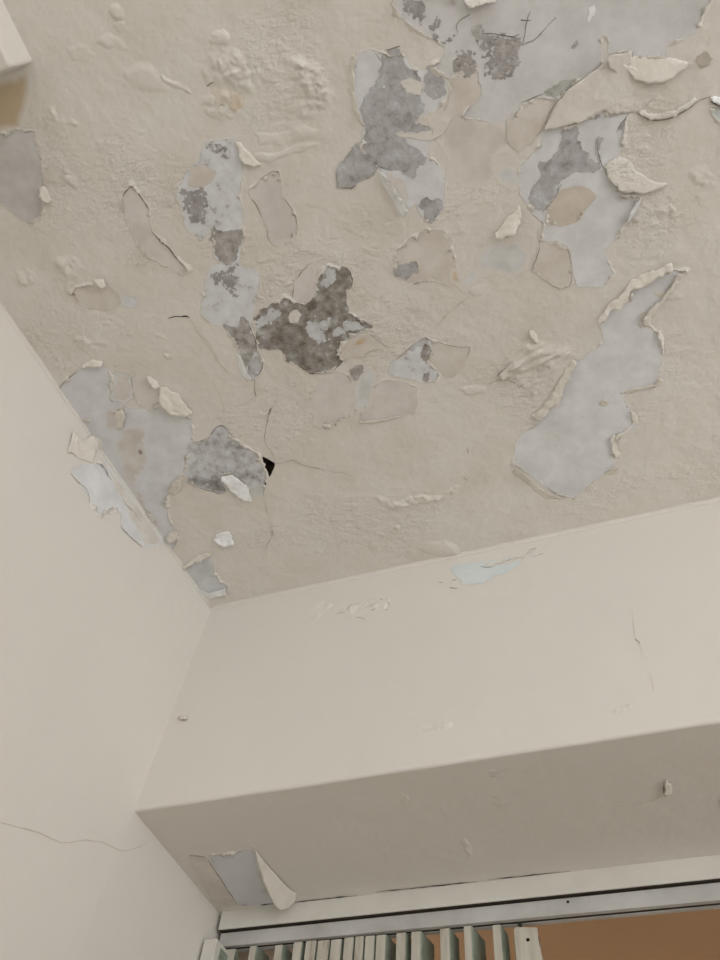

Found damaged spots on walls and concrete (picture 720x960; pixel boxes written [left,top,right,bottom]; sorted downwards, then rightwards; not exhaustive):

peeling [0,127,65,226]
peeling [336,0,714,292]
peeling [119,180,193,278]
flaking render [174,137,373,382]
flaking render [388,336,472,384]
peeling [510,263,691,500]
peeling [60,359,275,552]
peeling [182,531,234,600]
peeling [189,845,296,910]